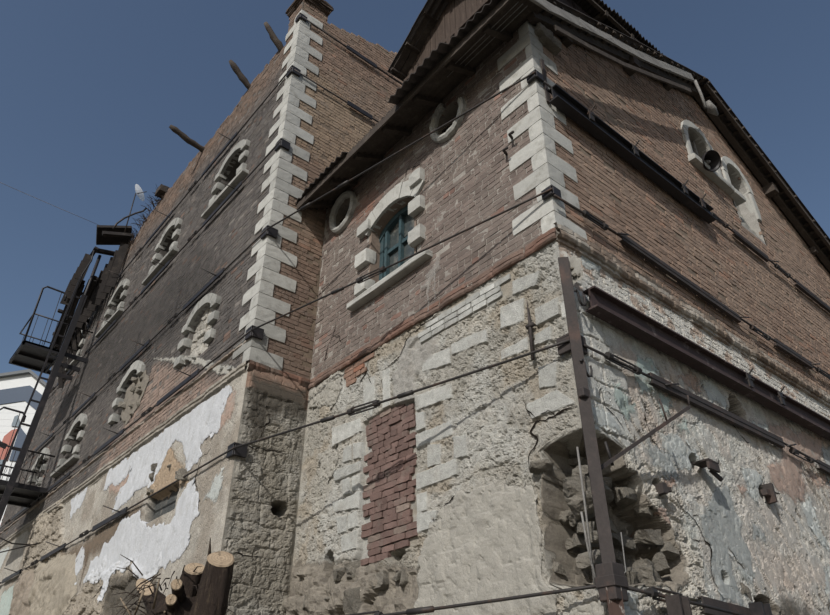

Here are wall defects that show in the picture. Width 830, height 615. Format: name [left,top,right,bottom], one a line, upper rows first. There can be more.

spalling [118,370,149,425]
spalling [154,355,234,374]
crack [524,402,574,464]
peeling [70,486,88,519]
peeling [75,385,236,602]
peeling [283,435,608,615]
spalling [591,382,689,615]
crack [640,495,744,588]